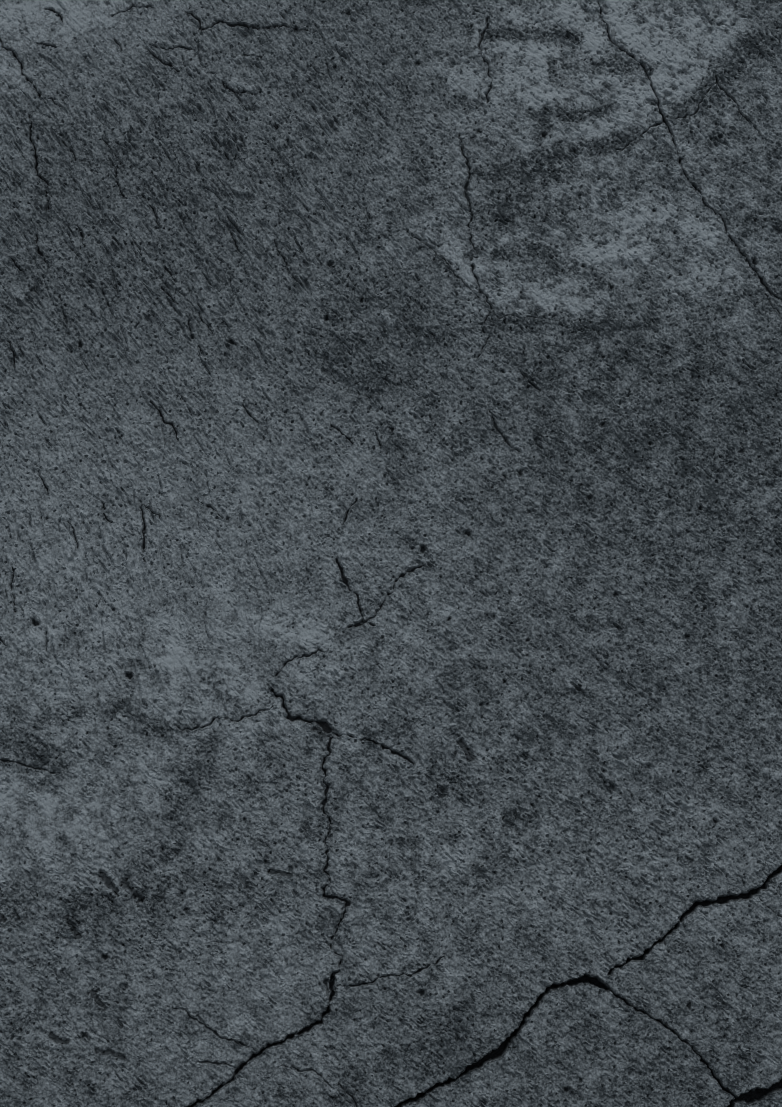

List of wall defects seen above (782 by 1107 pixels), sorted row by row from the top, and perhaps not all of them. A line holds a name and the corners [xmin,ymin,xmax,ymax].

crack [597,0,782,318]
crack [334,552,430,629]
crack [0,758,56,775]
crack [166,648,445,1107]
crack [394,864,782,1107]